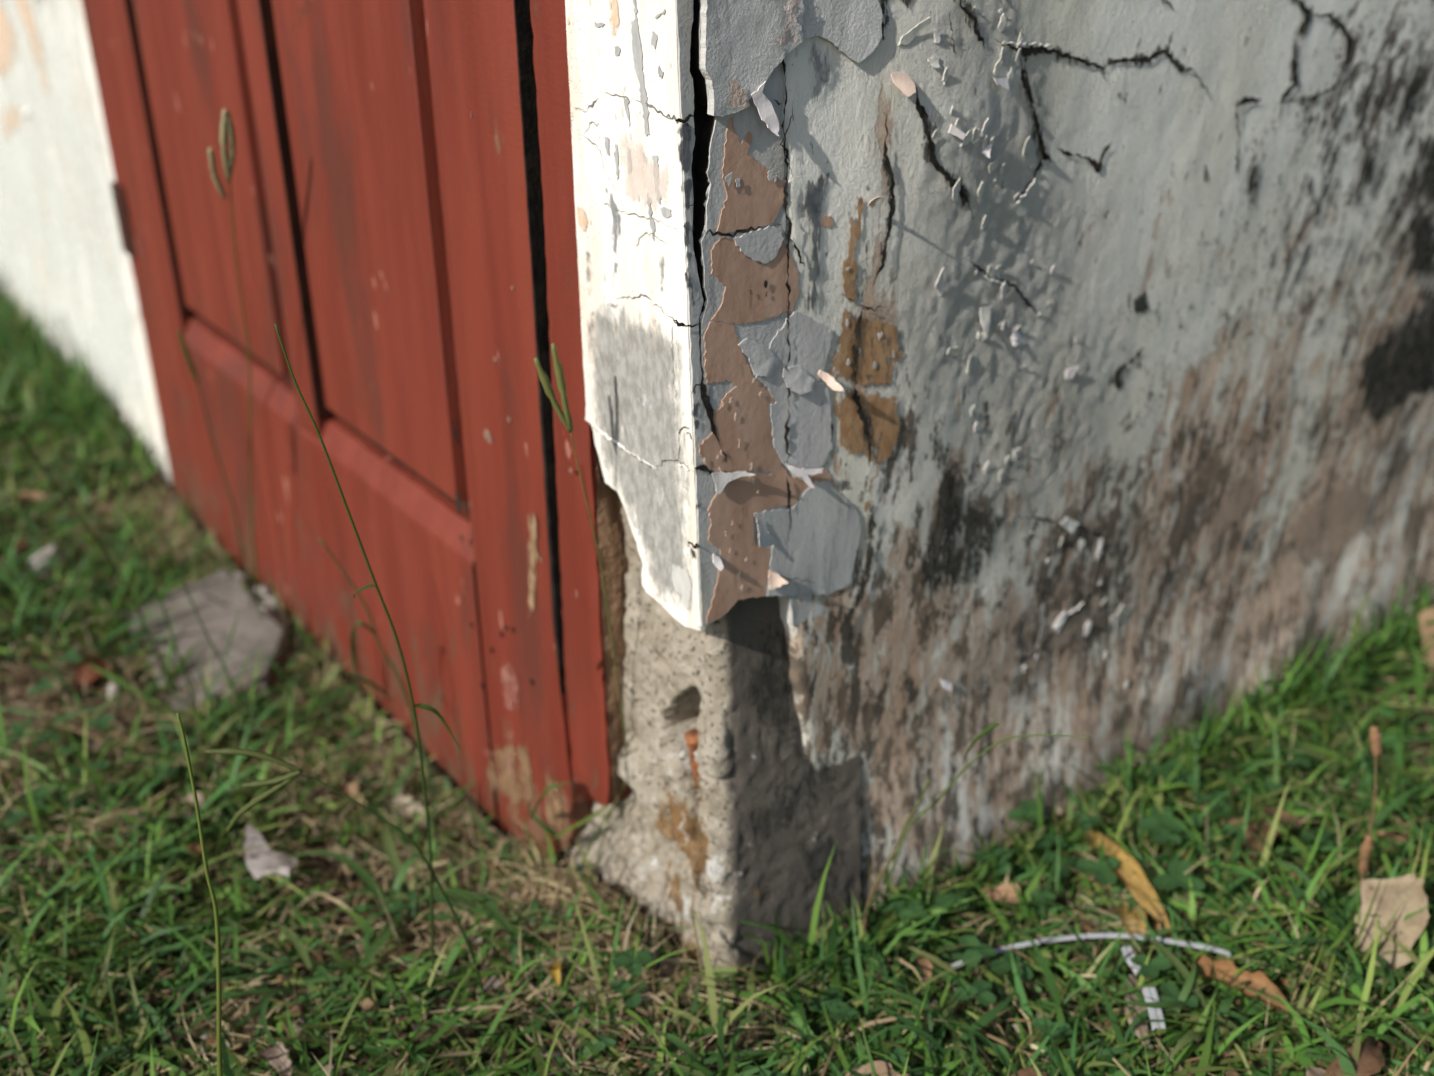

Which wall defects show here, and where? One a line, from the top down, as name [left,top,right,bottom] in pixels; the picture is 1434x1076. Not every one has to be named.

peeling [891,73,916,97]
crack [949,0,1354,204]
leakage [588,304,701,598]
leakage [678,123,695,306]
crack [571,0,815,583]
peeling [696,78,903,629]
leakage [799,172,829,311]
crack [841,87,974,465]
crack [970,262,1038,315]
leakage [1111,0,1434,468]
corrosion [660,801,706,910]
spalling [684,728,699,782]